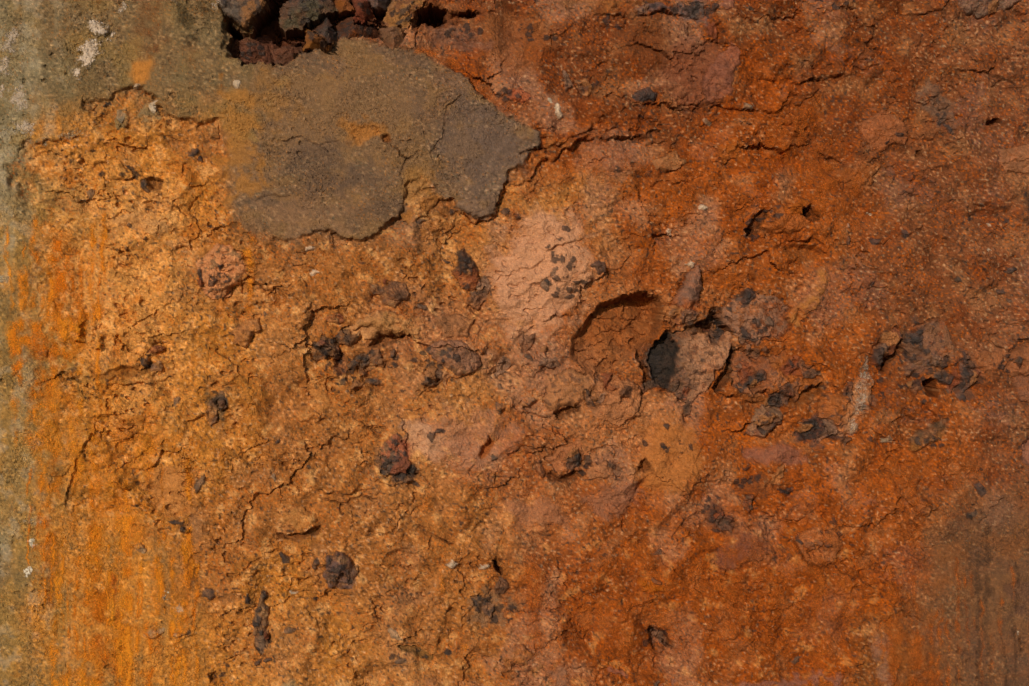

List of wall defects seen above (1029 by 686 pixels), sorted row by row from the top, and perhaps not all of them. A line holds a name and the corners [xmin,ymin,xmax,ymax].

rust [5,214,108,445]
rust [26,480,200,686]
spalling [222,13,257,60]
spalling [4,86,532,686]
spalling [394,0,1029,538]
spalling [479,197,949,686]